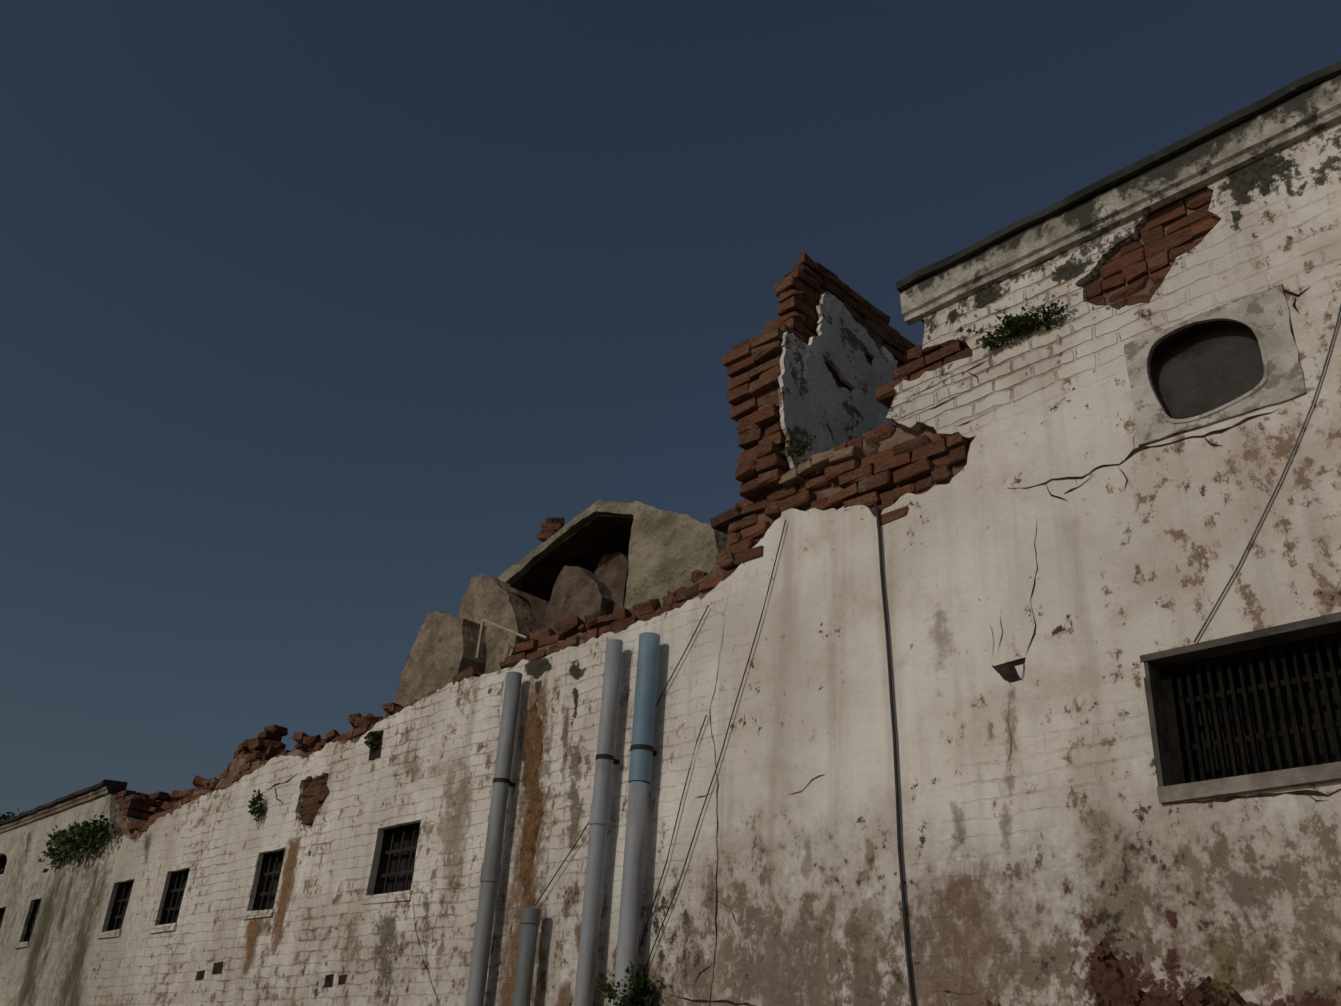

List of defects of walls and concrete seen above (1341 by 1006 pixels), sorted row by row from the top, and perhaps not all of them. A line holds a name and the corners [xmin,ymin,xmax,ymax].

spalling [1083,187,1221,310]
water stain [1219,153,1299,223]
spalling [710,340,975,581]
crack [991,408,1279,653]
spalling [299,774,330,827]
water stain [18,869,104,1006]
peeling [1067,911,1341,1006]